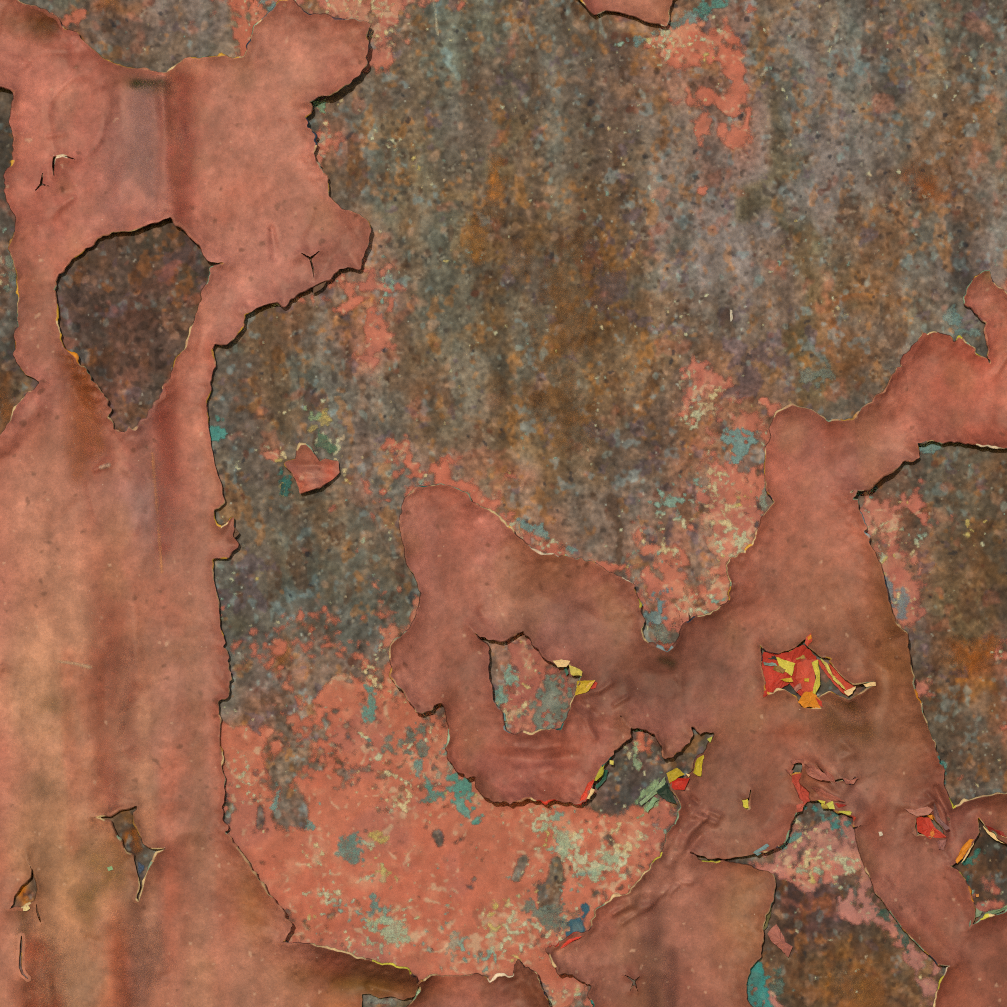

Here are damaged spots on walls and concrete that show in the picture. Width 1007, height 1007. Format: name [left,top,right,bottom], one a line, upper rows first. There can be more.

peeling [0,86,39,435]
peeling [54,217,224,432]
peeling [206,0,1007,1007]
peeling [94,806,165,902]